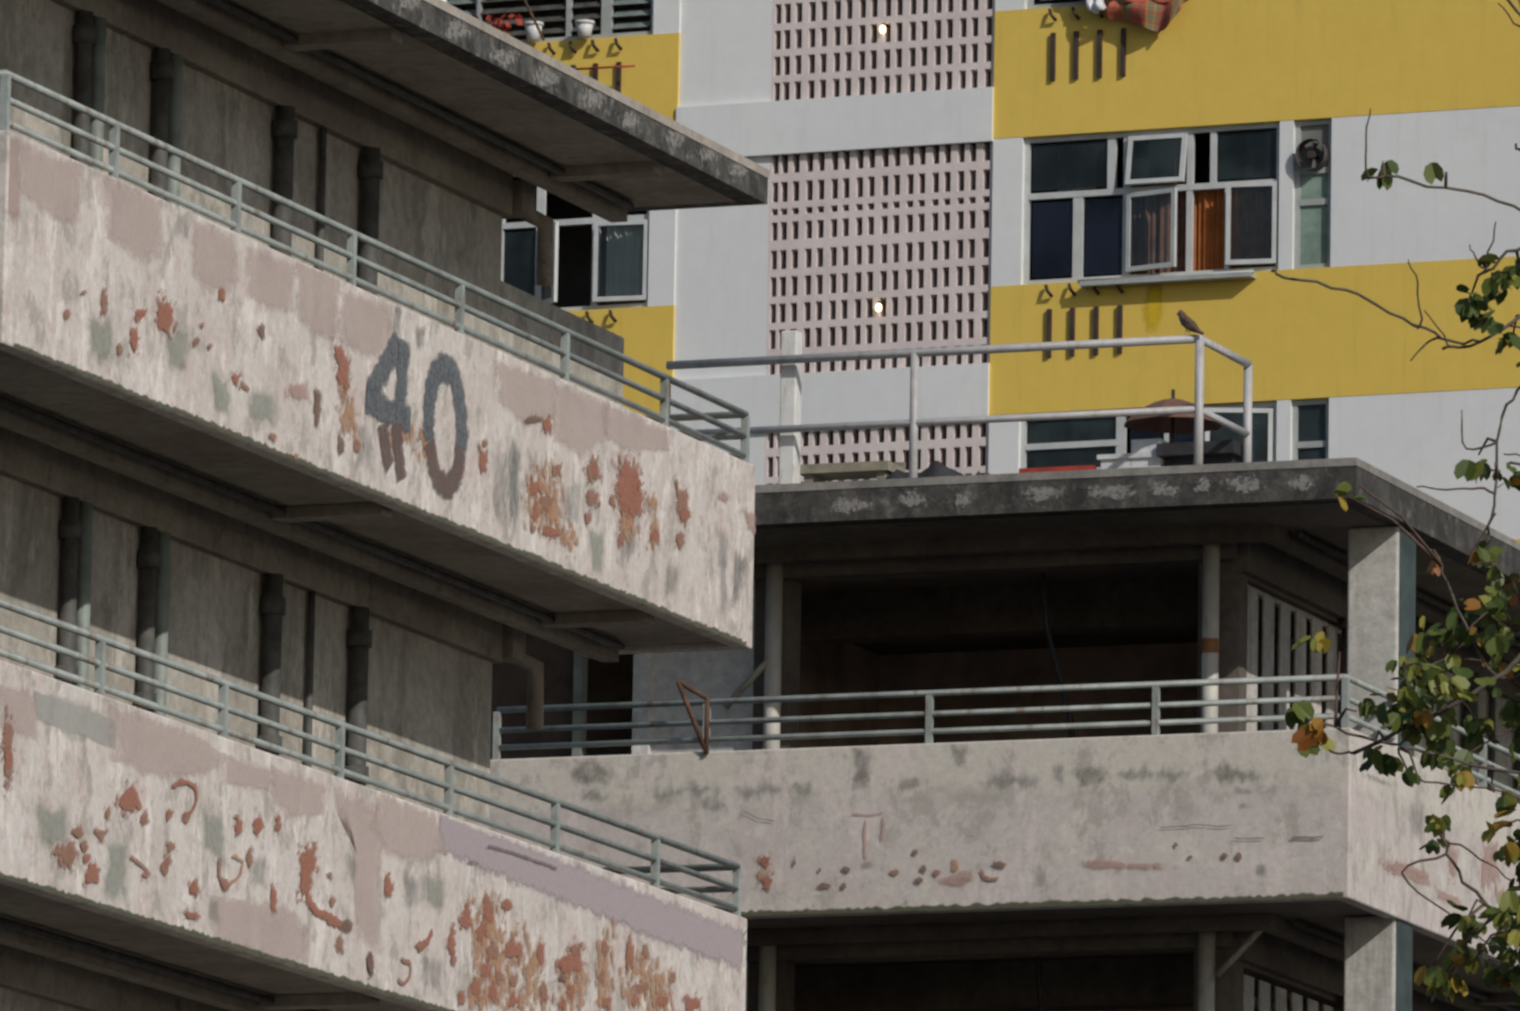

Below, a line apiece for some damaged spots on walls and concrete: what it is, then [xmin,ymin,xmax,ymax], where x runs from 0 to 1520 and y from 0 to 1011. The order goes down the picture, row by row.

spalling [521,449,693,563]
spalling [52,779,198,887]
spalling [184,878,201,926]
spalling [218,811,282,897]
spalling [296,837,353,954]
spalling [384,871,395,897]
spalling [818,866,851,889]
spalling [889,849,1006,885]
spalling [367,951,376,978]
spalling [398,891,704,1011]